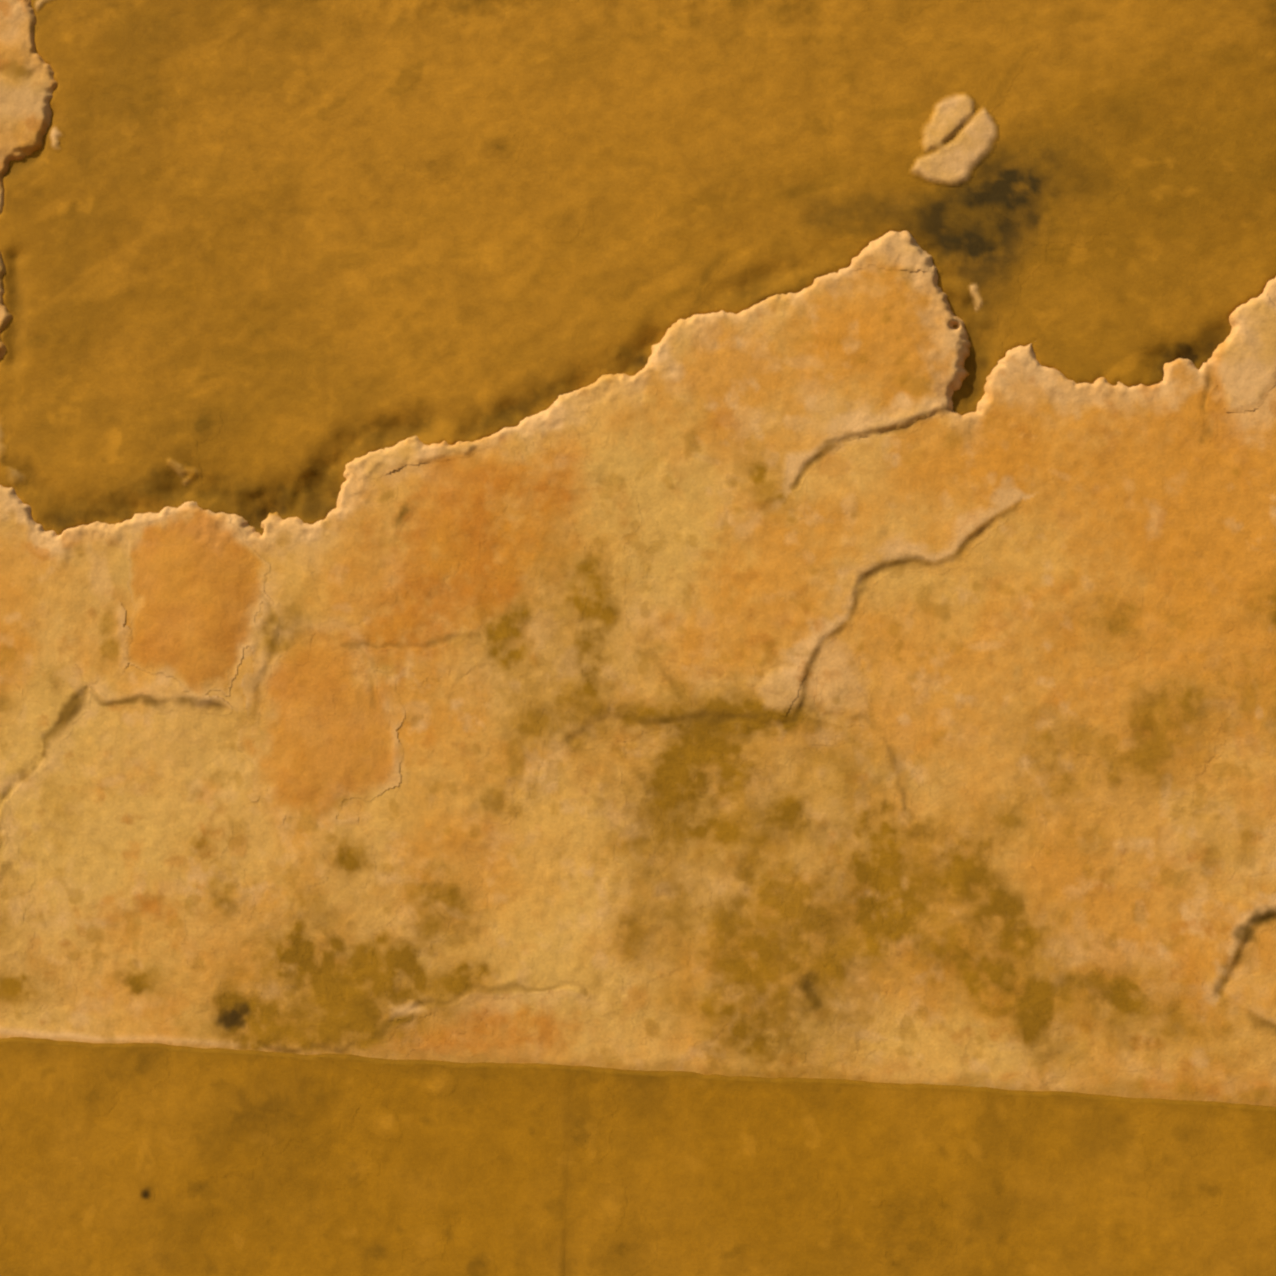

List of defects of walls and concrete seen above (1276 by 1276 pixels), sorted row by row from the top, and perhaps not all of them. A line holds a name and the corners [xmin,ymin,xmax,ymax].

flaking render [0,0,65,214]
peeling [908,92,999,187]
crack [0,592,282,888]
flaking render [0,409,319,1045]
flaking render [336,666,610,1000]
flaking render [229,231,1276,802]
crack [562,498,1025,826]
leakage [455,486,1276,1085]
crack [789,404,954,494]
flaking render [838,992,1064,1091]
flaking render [1026,735,1276,1019]
crack [1212,930,1276,1041]